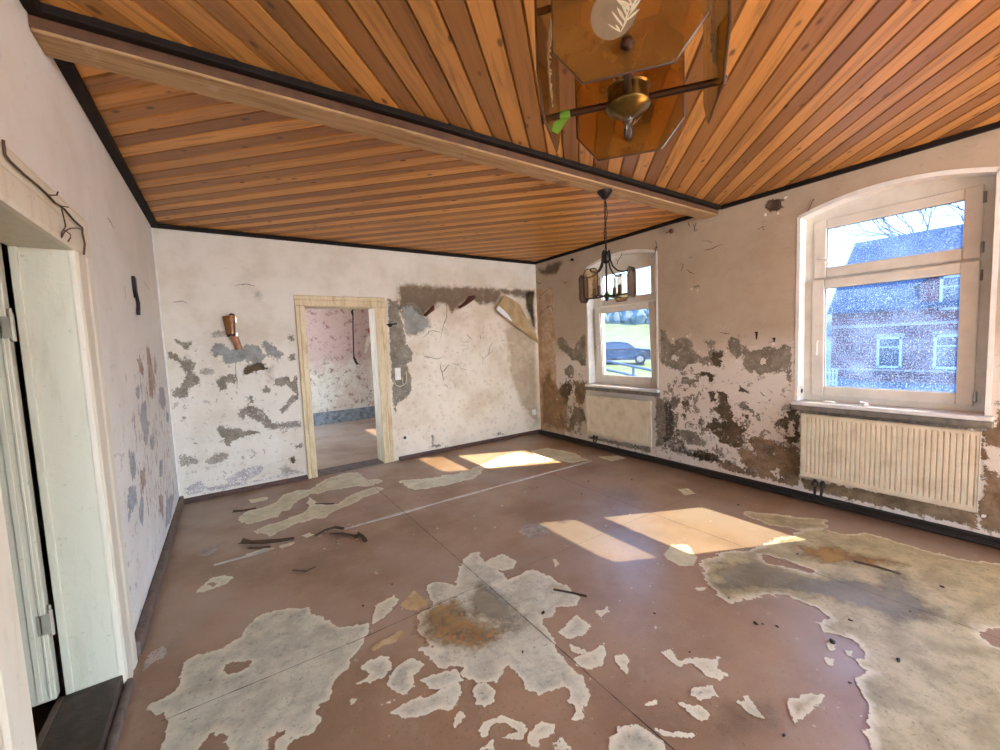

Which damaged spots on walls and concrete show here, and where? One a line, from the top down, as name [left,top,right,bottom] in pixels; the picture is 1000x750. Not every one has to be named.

flaking render [764,196,788,216]
leakage [539,262,561,274]
flaking render [385,297,415,413]
flaking render [127,326,307,538]
flaking render [399,329,1000,534]
peeling [238,472,384,555]
peeling [142,552,630,750]
corrosion [423,600,504,648]
peeling [661,511,1000,750]